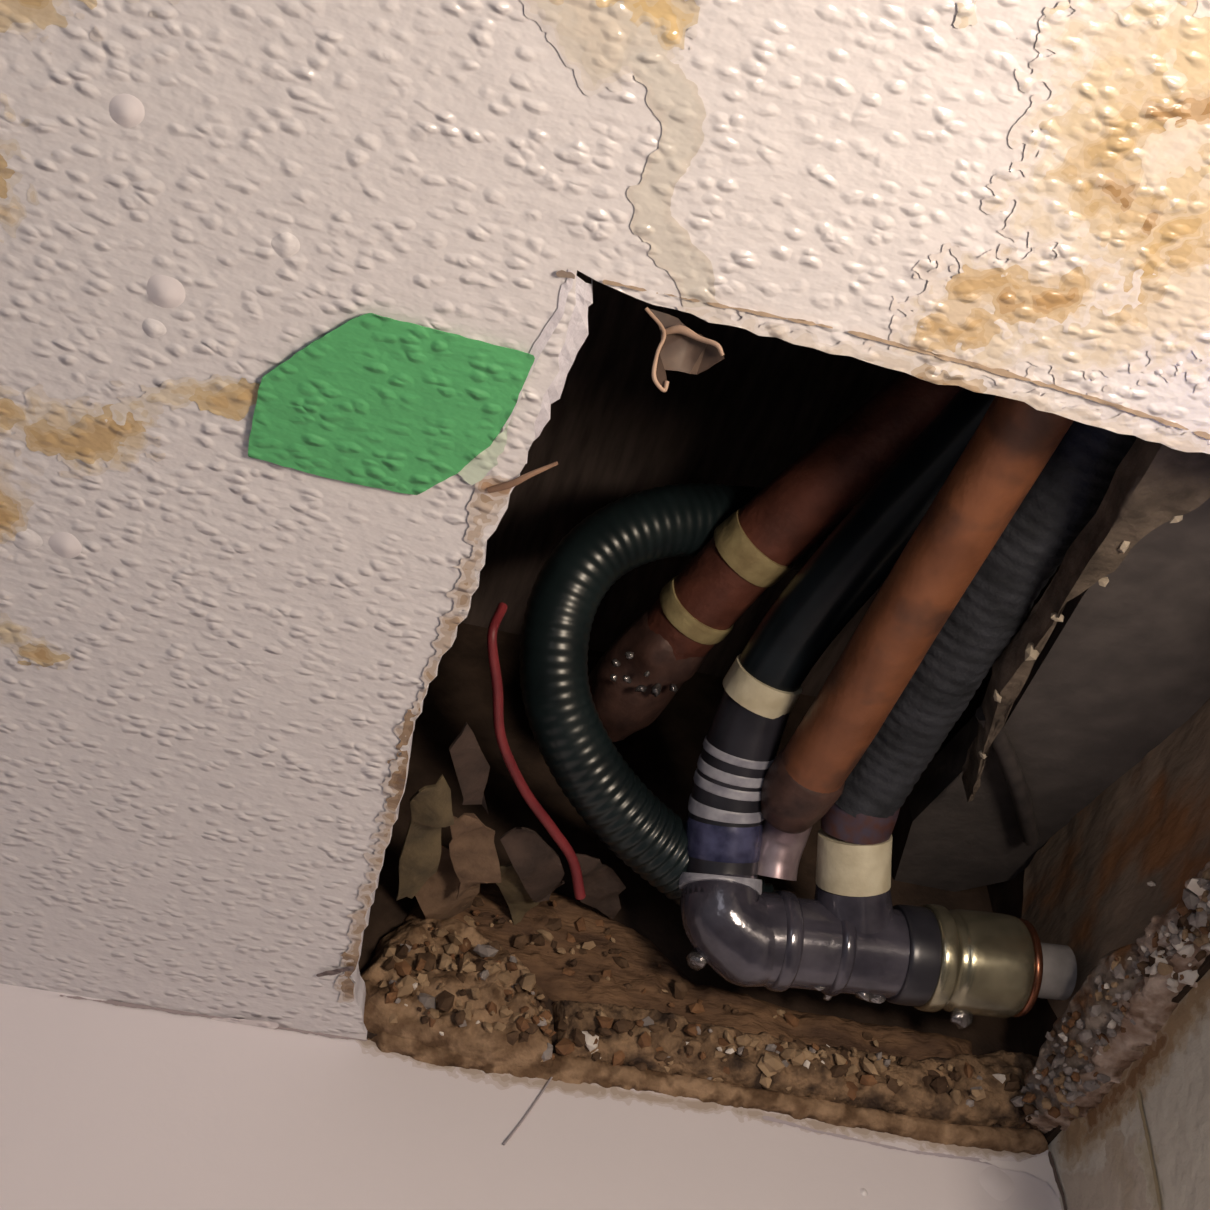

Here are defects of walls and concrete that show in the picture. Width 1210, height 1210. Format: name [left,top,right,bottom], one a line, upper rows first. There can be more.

leakage [0,0,103,54]
leakage [0,93,40,253]
leakage [520,0,718,308]
leakage [861,0,1210,398]
leakage [0,374,260,568]
spalling [458,269,593,494]
leakage [0,593,75,670]
spalling [1025,642,1039,661]
spalling [360,862,1210,1198]